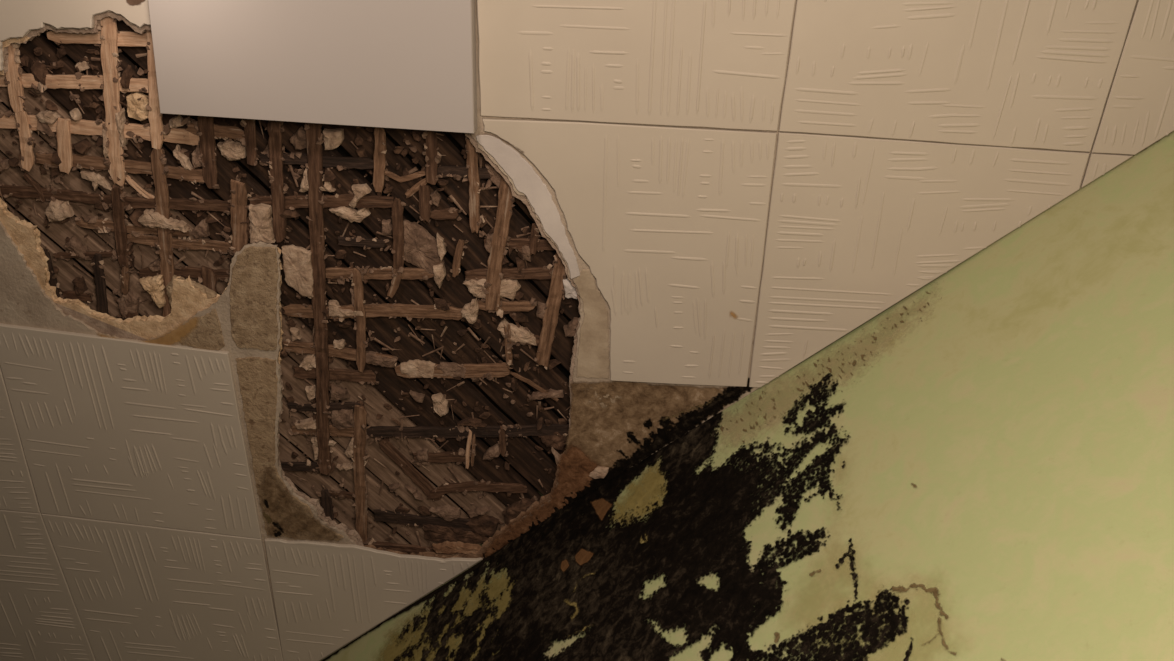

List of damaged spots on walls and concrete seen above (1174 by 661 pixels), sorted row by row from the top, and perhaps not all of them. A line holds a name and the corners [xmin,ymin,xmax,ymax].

flaking render [0,11,612,559]
leakage [379,292,956,661]